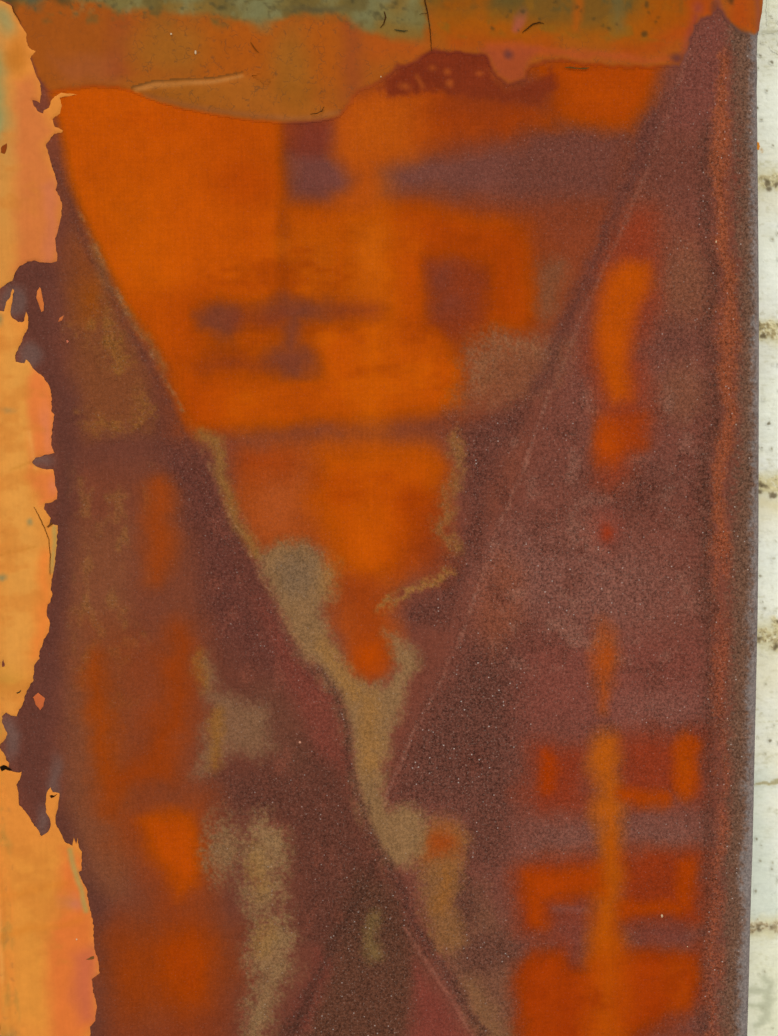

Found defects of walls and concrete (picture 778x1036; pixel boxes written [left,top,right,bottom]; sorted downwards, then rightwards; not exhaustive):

peeling [0,287,100,1036]
corrosion [58,462,245,1036]
corrosion [43,53,674,677]
peeling [0,0,773,288]
corrosion [498,44,747,1036]